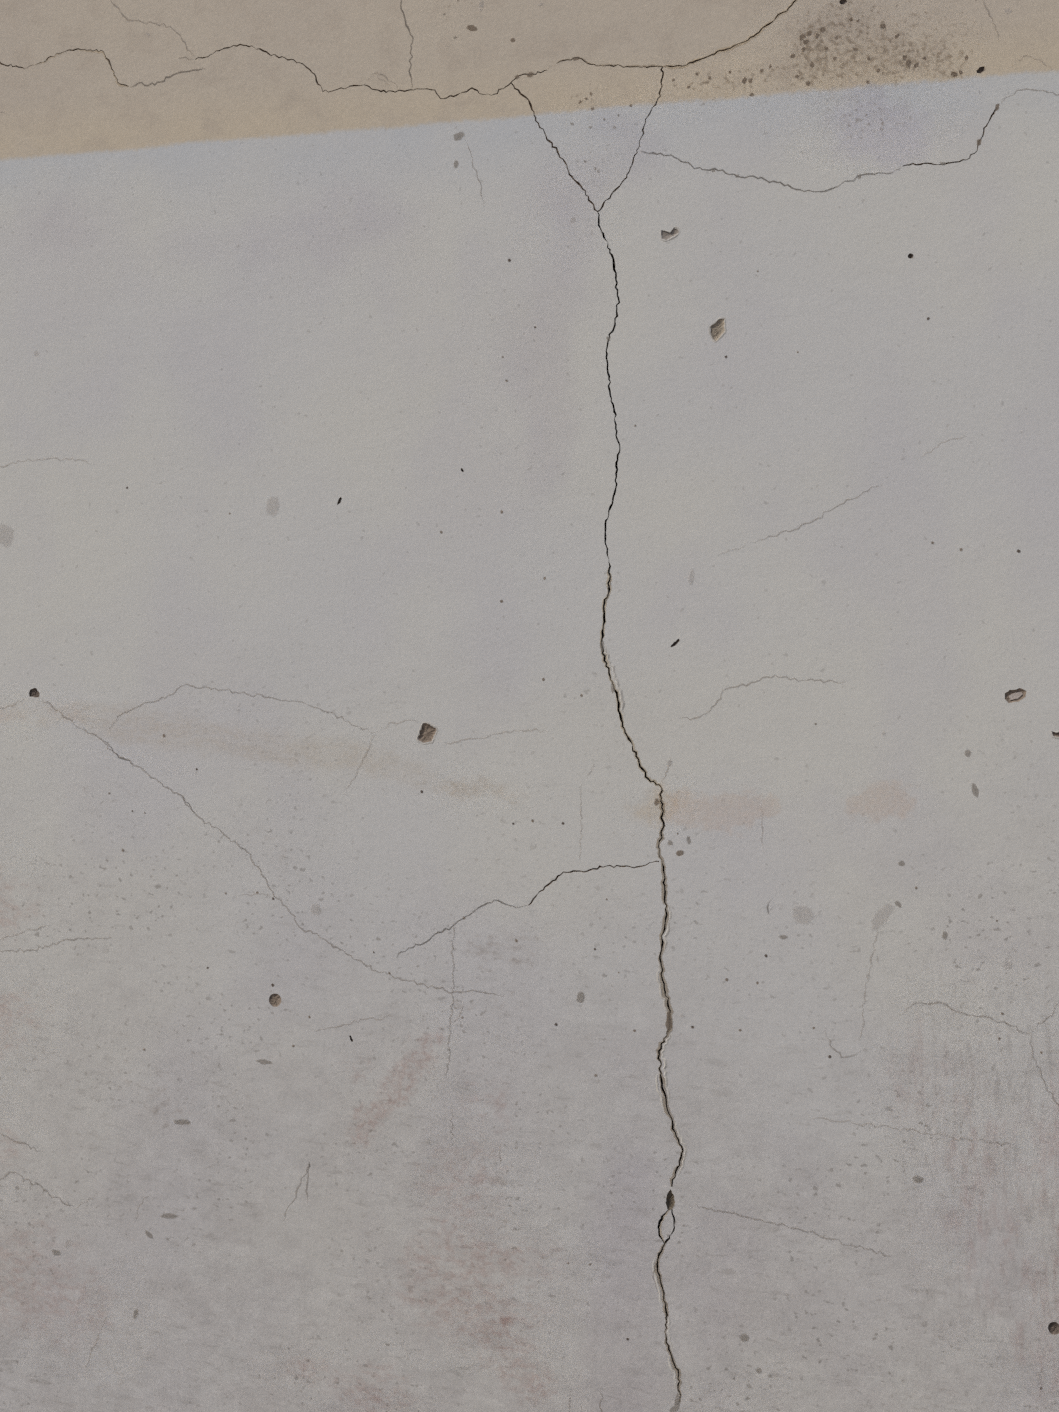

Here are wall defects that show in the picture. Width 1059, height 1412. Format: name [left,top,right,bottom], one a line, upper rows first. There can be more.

crack [0,48,129,87]
crack [903,107,998,166]
crack [196,0,796,1401]